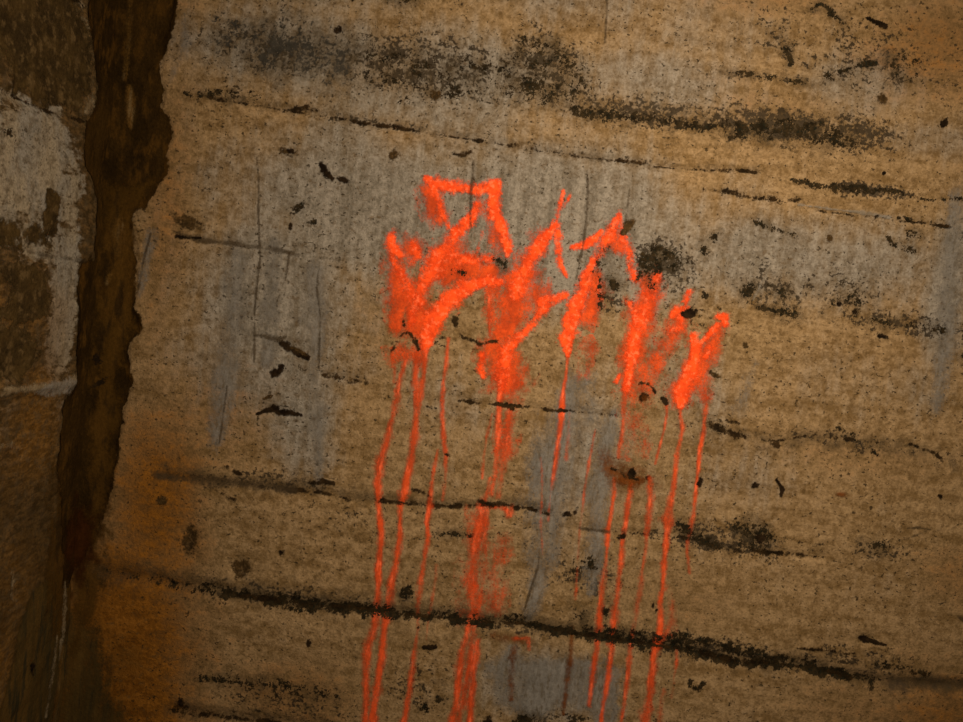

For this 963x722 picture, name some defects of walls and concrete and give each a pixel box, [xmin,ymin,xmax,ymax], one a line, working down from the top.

water stain [183,85,263,104]
water stain [212,7,861,149]
water stain [821,58,878,81]
water stain [883,48,918,83]
water stain [398,582,414,599]
water stain [0,576,123,722]
water stain [194,670,339,702]
water stain [489,645,619,722]